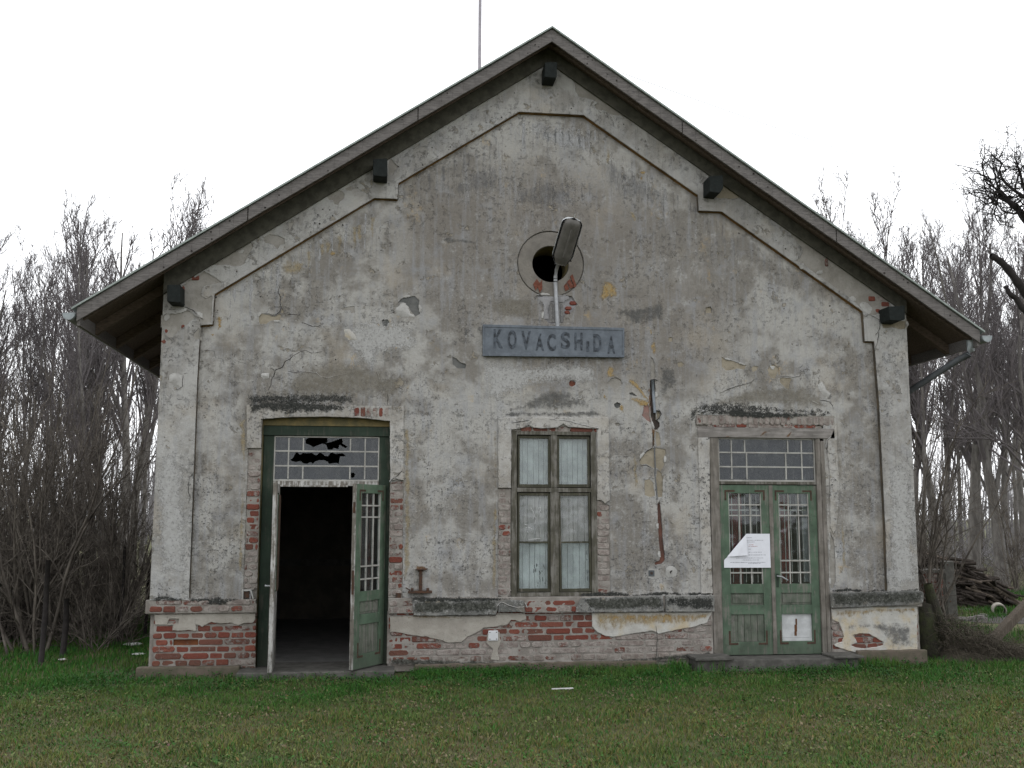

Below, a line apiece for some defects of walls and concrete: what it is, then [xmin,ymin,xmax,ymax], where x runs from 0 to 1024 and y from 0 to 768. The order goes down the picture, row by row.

flaking render [382,295,422,326]
flaking render [533,274,577,325]
crack [264,286,347,390]
damp [240,320,416,455]
damp [691,389,829,421]
flaking render [640,448,667,497]
flaking render [148,449,262,668]
flaking render [387,481,713,665]
flaking render [830,608,883,652]